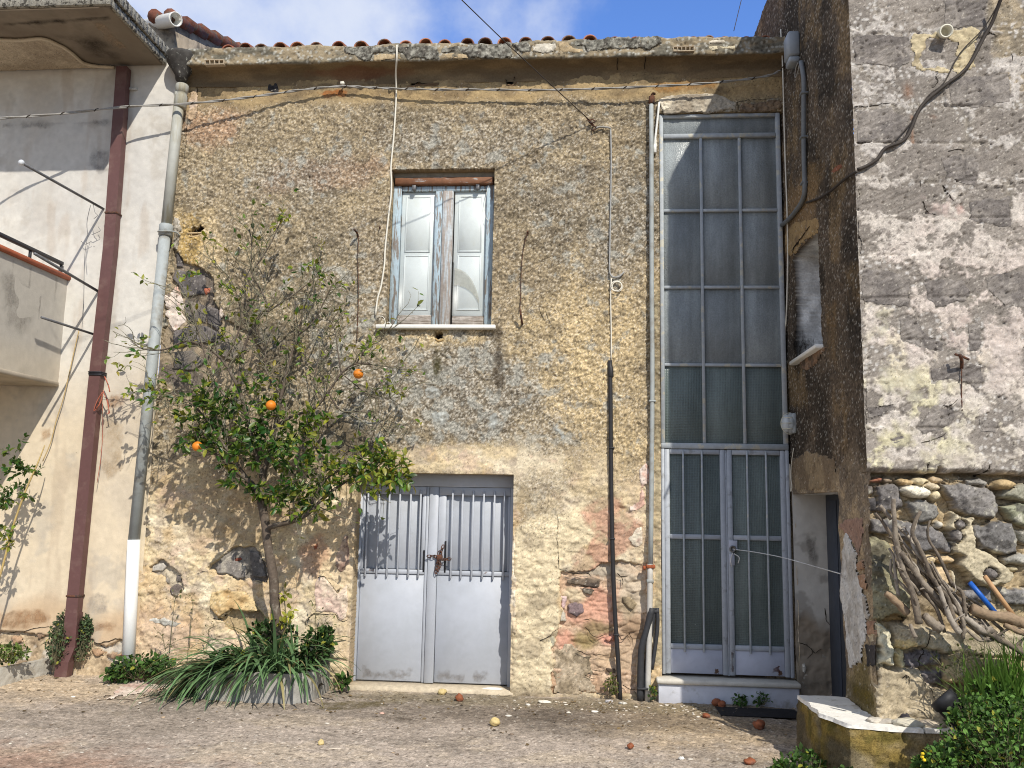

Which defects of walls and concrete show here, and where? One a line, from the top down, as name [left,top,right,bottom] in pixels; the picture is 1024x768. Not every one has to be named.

flaking render [158,217,263,390]
peeling [630,463,649,511]
peeling [628,527,643,547]
flaking render [151,559,184,597]
flaking render [211,546,269,582]
peeling [838,517,877,668]
flaking render [526,560,647,713]